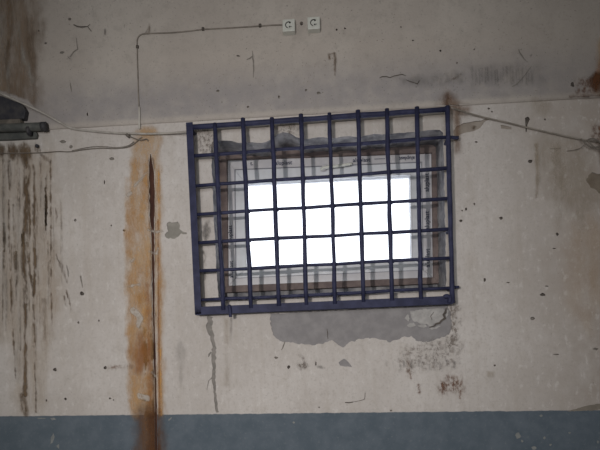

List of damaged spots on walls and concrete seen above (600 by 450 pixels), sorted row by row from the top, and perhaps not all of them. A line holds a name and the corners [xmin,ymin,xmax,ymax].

rust [578,73,600,92]
damp [0,143,41,296]
rust [127,129,162,276]
damp [21,335,36,416]
rust [130,280,162,450]
crack [149,154,157,450]
crack [206,316,219,413]
spalling [270,305,452,347]